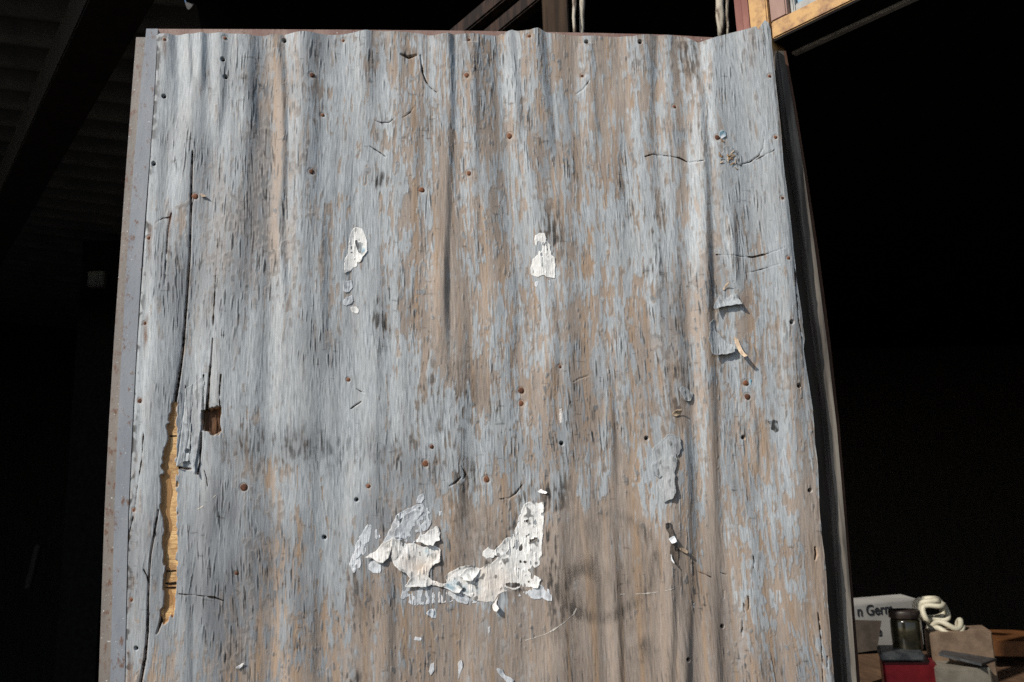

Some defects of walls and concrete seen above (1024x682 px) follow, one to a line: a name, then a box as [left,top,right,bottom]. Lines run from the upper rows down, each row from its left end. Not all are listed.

crack [160,152,222,411]
peeling [343,227,368,314]
peeling [531,233,556,287]
peeling [708,282,748,357]
crack [716,250,777,272]
peeling [349,489,552,618]